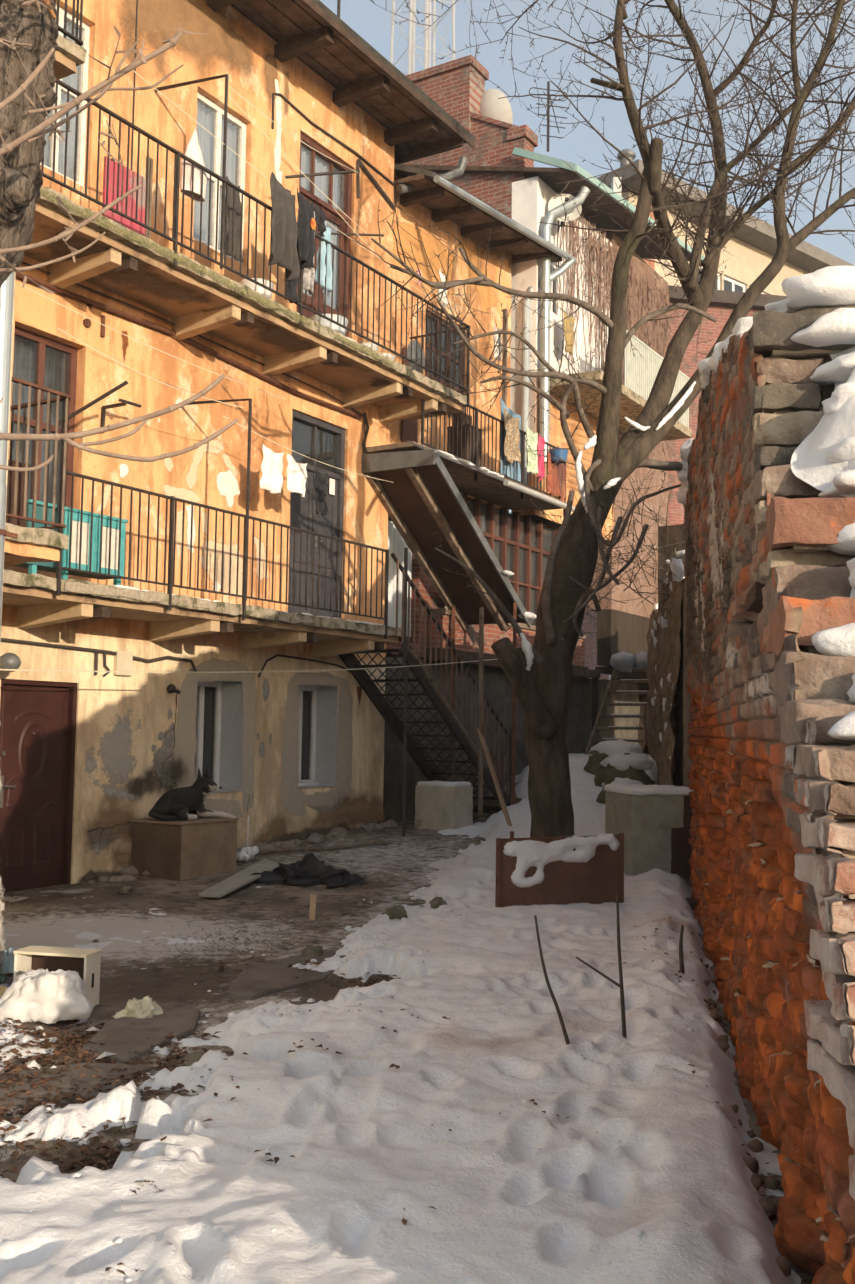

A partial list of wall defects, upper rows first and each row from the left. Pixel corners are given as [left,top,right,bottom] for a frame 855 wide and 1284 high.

peeling [163,440,269,609]
spalling [65,581,162,603]
peeling [85,710,140,800]
peeling [151,708,175,786]